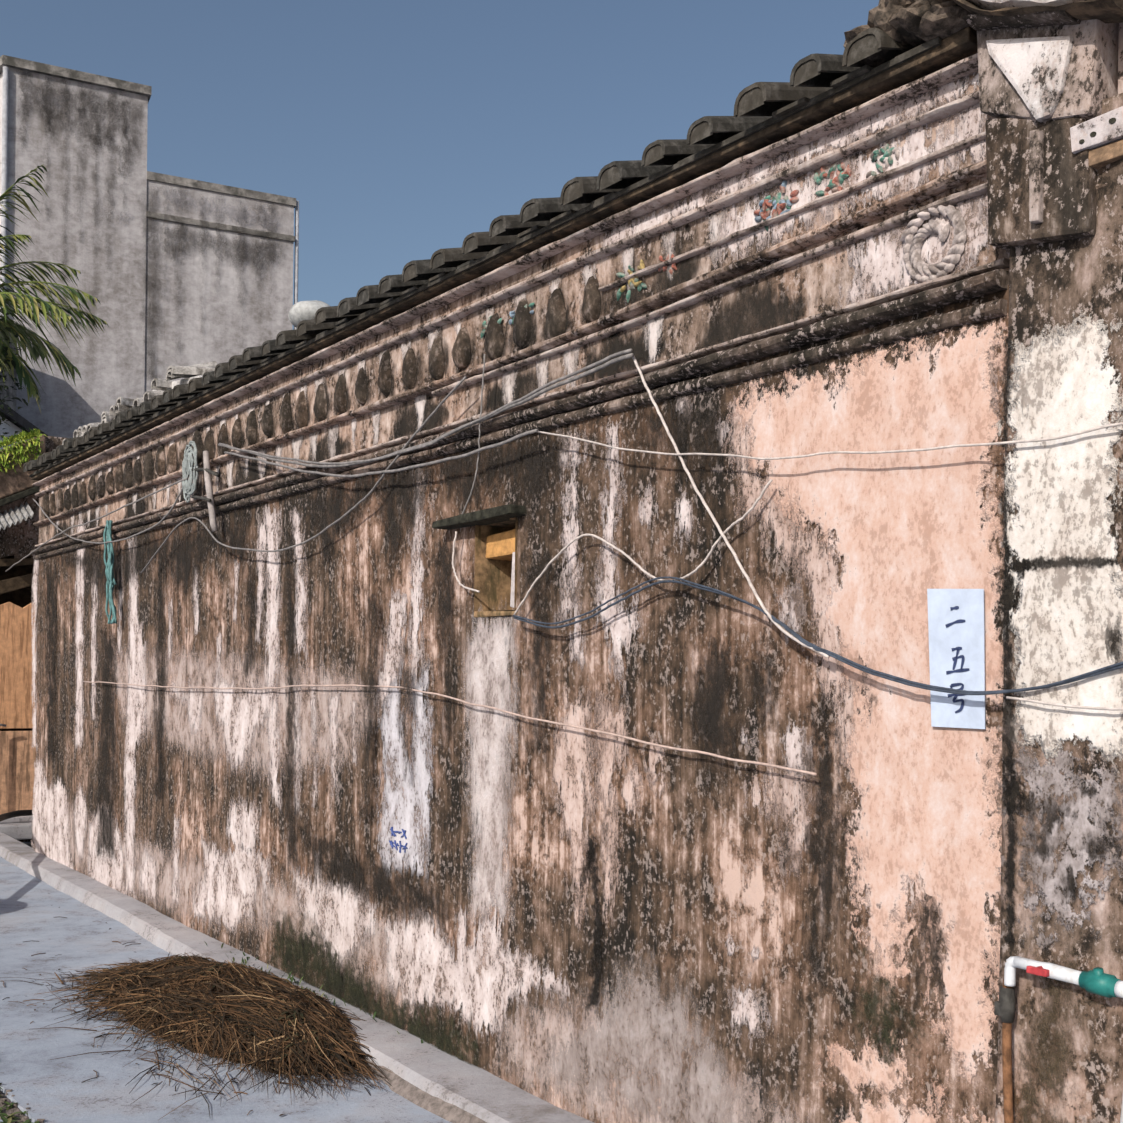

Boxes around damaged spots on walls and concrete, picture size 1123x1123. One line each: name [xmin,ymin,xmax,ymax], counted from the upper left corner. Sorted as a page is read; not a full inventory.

water stain [564,315,665,389]
water stain [549,231,698,333]
water stain [709,211,724,260]
water stain [695,283,805,356]
water stain [640,396,721,494]
water stain [31,316,640,1067]
water stain [690,638,776,783]
water stain [802,696,846,989]
water stain [918,894,945,993]
water stain [505,1000,792,1123]
water stain [851,977,925,1066]
water stain [1012,977,1092,1123]